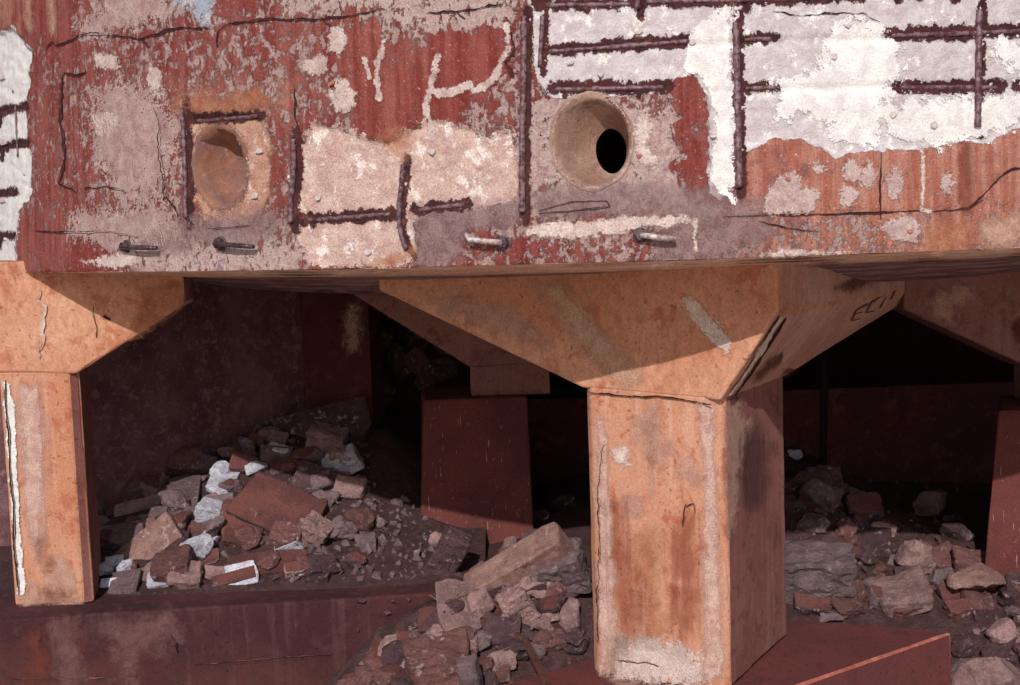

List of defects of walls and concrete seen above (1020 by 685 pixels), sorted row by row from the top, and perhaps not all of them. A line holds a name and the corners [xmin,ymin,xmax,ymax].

spalling [0,26,33,261]
crack [58,71,126,193]
peeling [64,51,274,256]
crack [46,8,383,50]
spalling [267,22,519,278]
spalling [527,0,1020,208]
peeling [763,170,820,217]
crack [683,6,1020,231]
peeling [876,213,922,243]
crack [590,316,786,405]
crack [595,445,604,643]
damp [593,401,769,685]